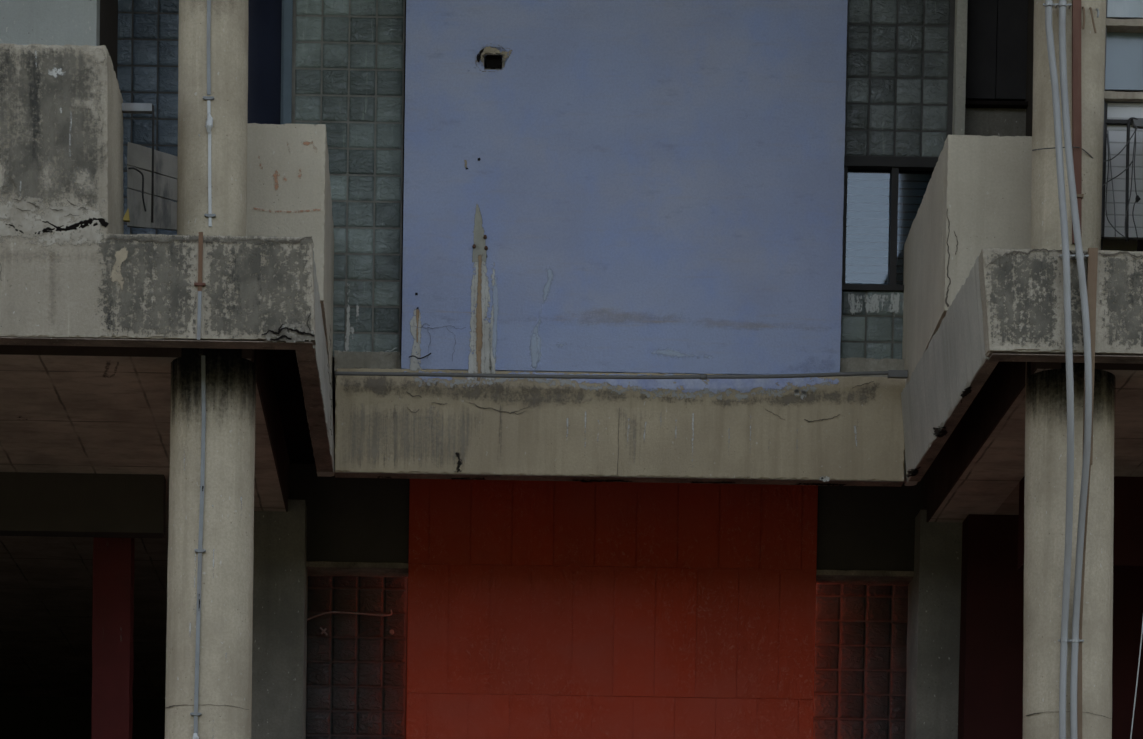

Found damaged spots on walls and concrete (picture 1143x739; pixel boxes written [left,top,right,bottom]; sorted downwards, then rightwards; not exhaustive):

water stain [0,49,105,205]
crack [6,177,314,248]
water stain [98,234,312,338]
crack [261,314,332,435]
water stain [343,204,599,446]
peeling [404,371,839,400]
water stain [986,252,1143,347]